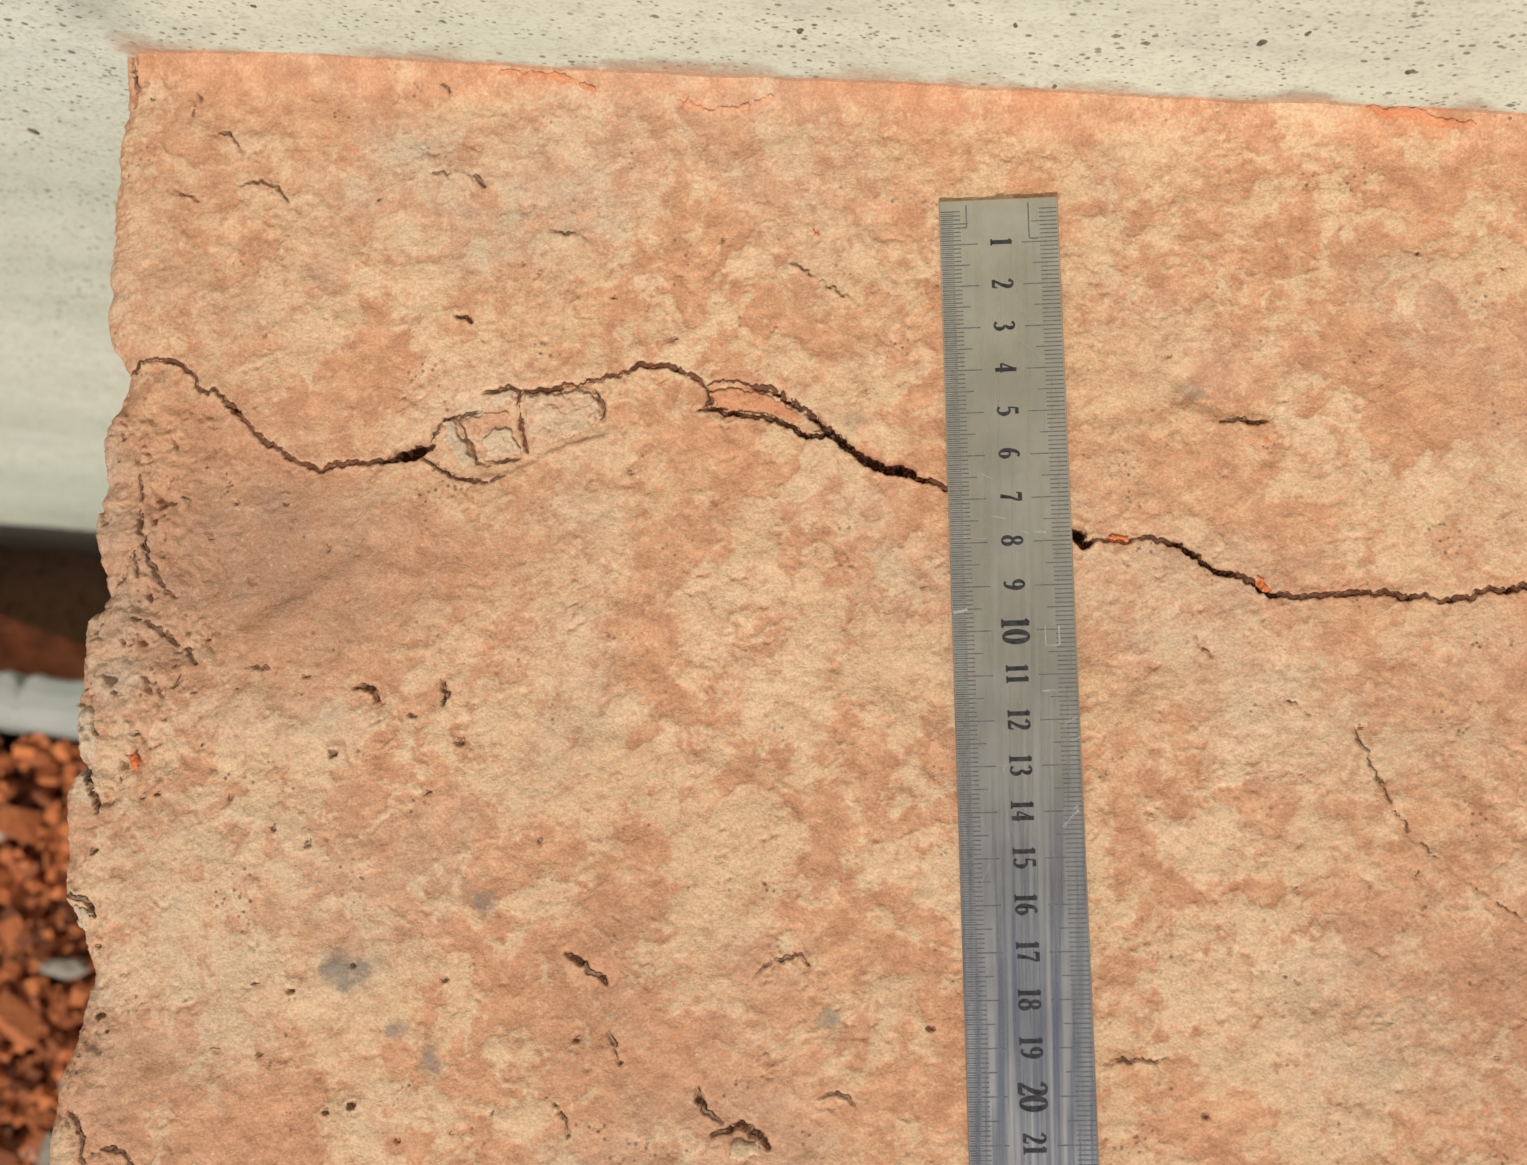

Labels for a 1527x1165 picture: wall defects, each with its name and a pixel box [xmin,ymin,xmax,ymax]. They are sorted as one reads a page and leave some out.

crack [130,357,948,490]
crack [132,474,195,687]
crack [1072,530,1527,603]